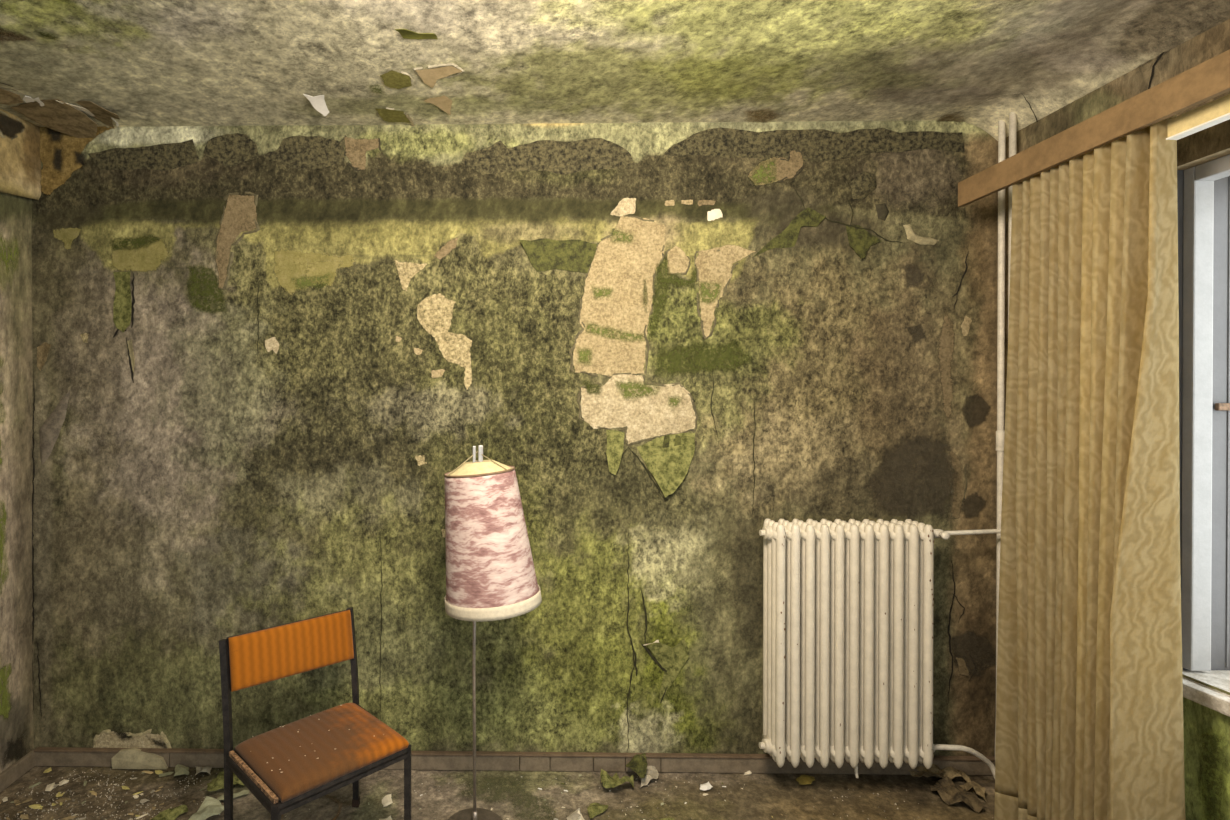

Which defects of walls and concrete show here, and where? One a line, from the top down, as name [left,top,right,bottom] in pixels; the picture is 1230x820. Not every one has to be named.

damp [0,29,68,48]
spalling [0,88,120,195]
damp [747,109,777,122]
damp [938,114,960,122]
flaking render [215,192,260,290]
flaking render [395,238,458,291]
damp [905,263,923,287]
flaking render [417,293,472,389]
flaking render [519,198,826,497]
damp [963,394,991,428]
damp [869,435,986,518]
damp [951,631,996,677]